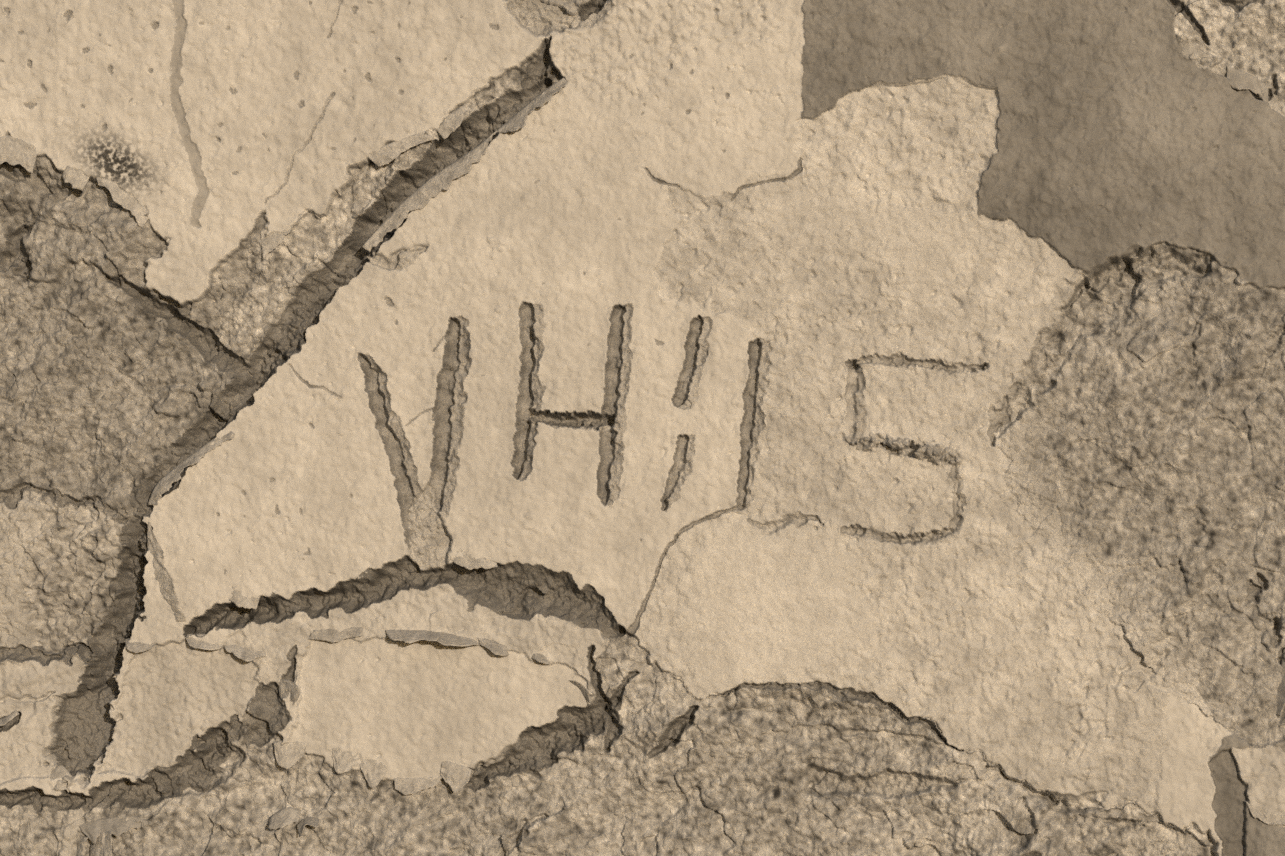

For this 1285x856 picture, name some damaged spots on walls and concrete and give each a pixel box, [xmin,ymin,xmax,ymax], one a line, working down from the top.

crack [170,0,210,229]
crack [327,0,343,39]
crack [731,158,803,202]
spalling [1167,0,1285,116]
spalling [0,130,443,509]
crack [51,36,739,811]
spalling [993,242,1285,749]
spalling [0,632,1218,856]